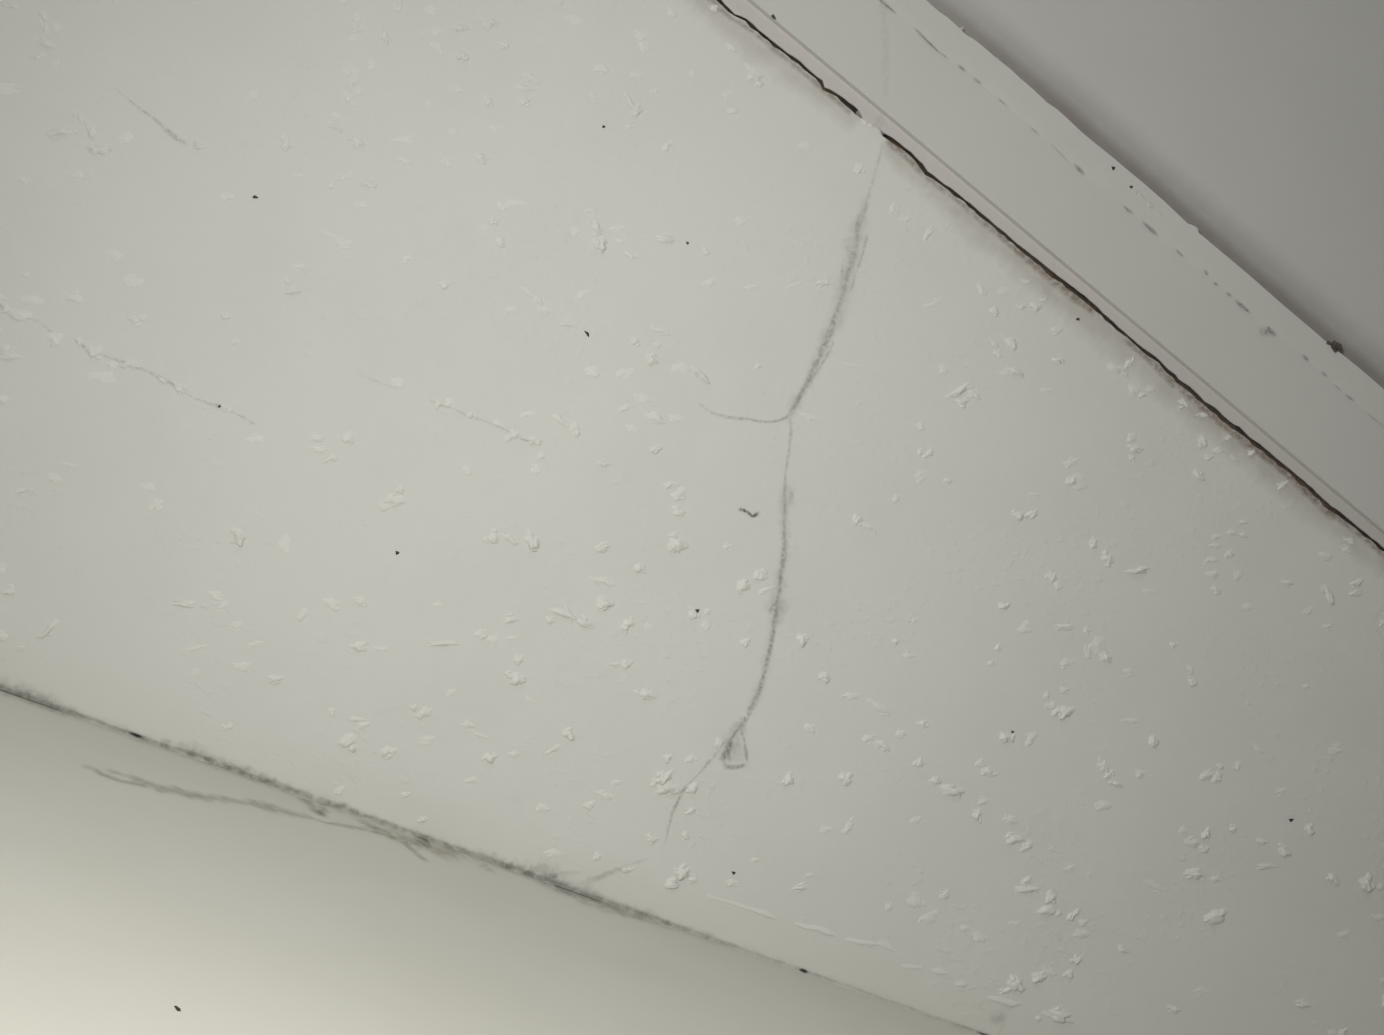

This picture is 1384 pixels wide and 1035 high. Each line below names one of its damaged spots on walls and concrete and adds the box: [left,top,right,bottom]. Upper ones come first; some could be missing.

crack [716,0,858,114]
crack [882,134,1384,551]